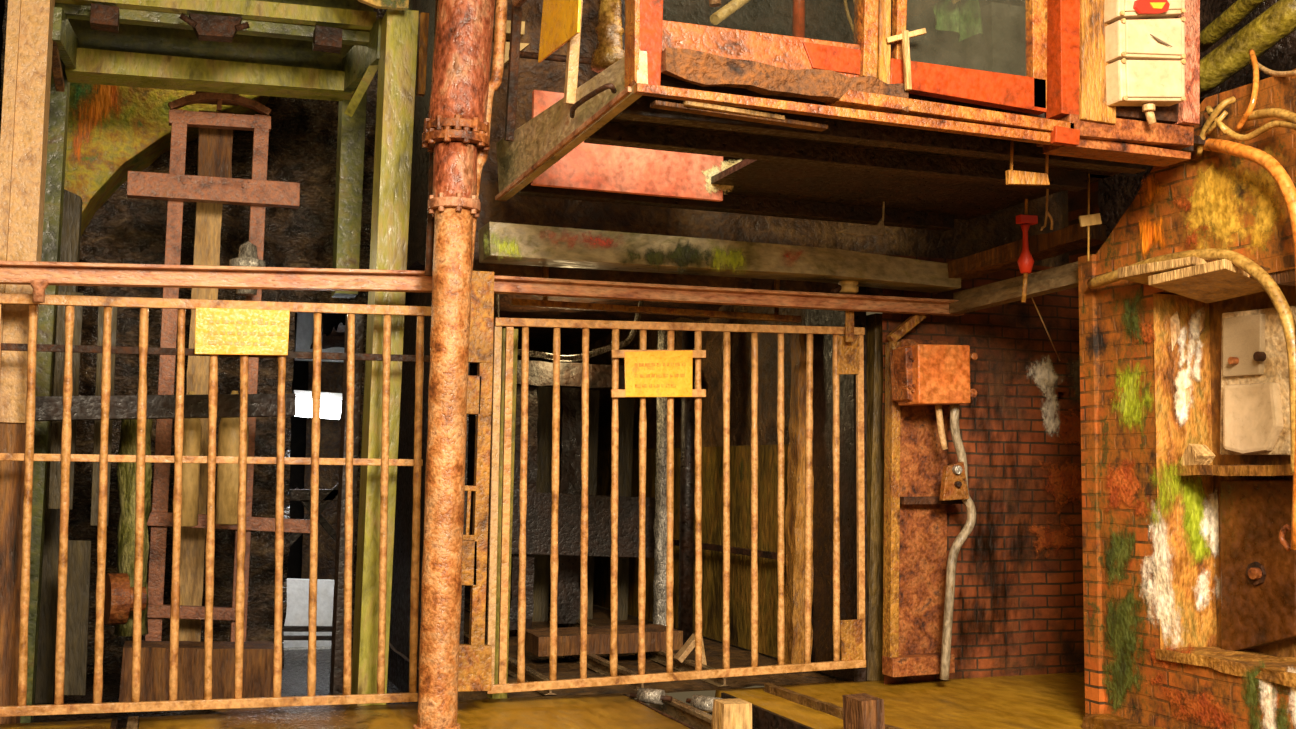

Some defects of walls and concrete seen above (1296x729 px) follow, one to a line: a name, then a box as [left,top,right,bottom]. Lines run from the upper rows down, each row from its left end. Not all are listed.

water stain [1142,507,1181,645]
water stain [1180,475,1221,609]
water stain [1243,662,1296,729]